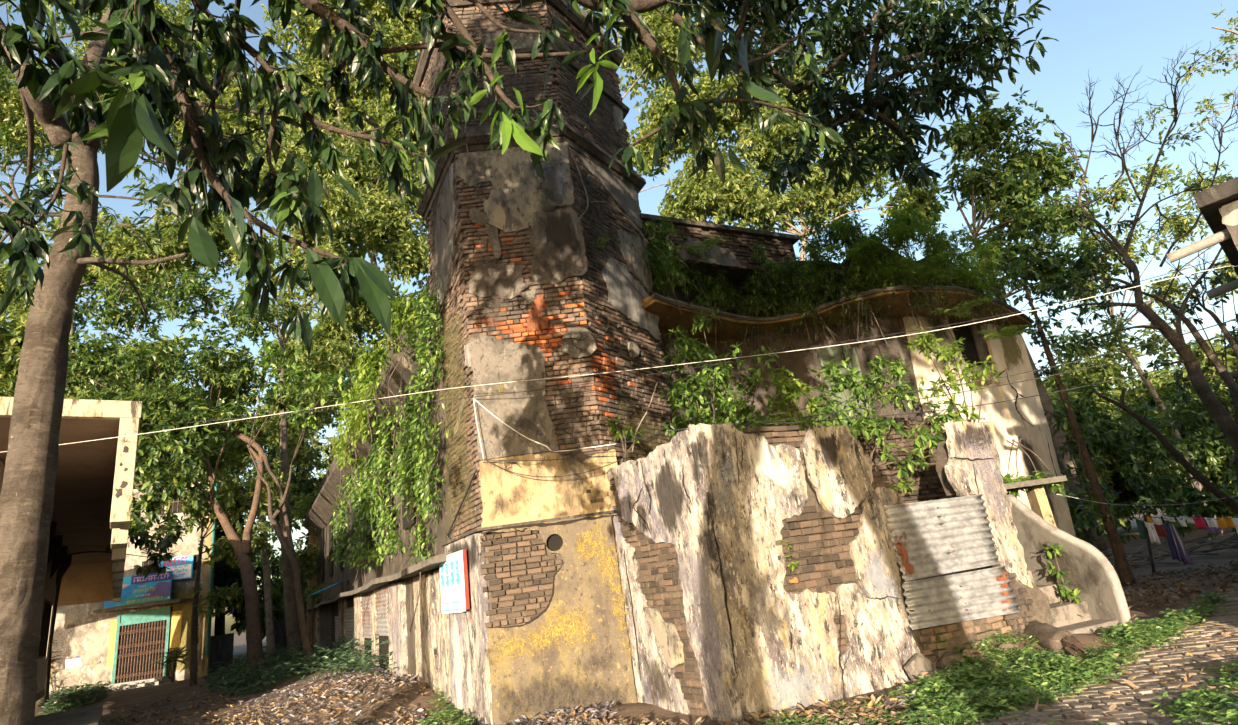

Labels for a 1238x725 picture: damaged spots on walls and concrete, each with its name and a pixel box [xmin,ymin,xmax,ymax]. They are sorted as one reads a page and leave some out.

flaking render [435,142,660,340]
flaking render [561,327,597,359]
flaking render [454,335,710,717]
spalling [775,501,865,652]
spalling [871,465,892,493]
rust [895,532,914,575]